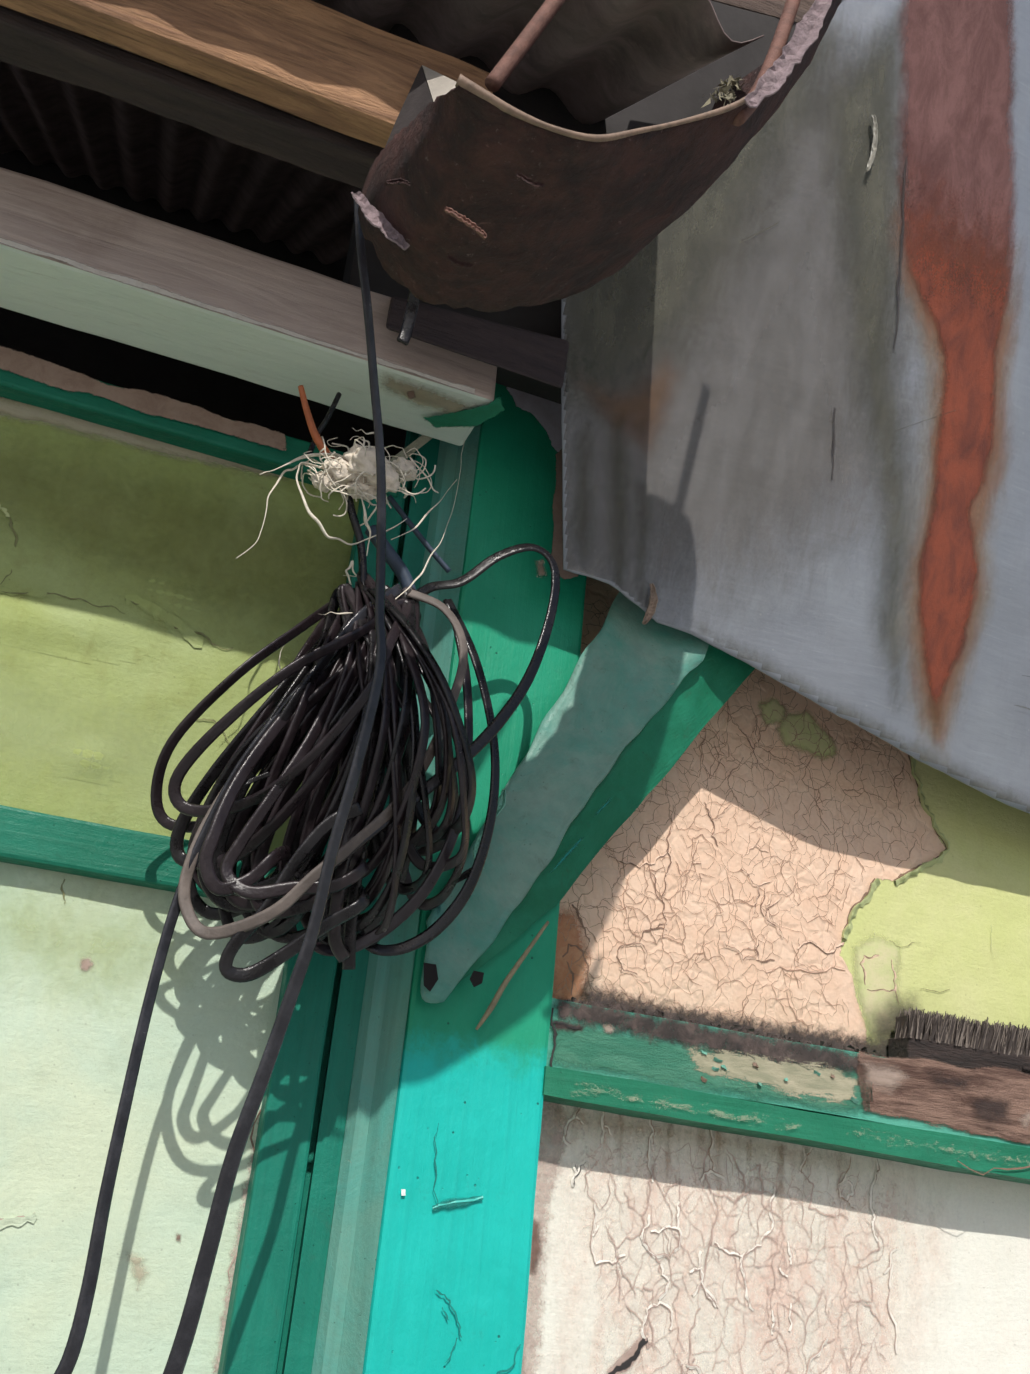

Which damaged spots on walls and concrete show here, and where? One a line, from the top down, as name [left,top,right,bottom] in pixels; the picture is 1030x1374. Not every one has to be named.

corrosion [444,206,487,240]
corrosion [901,0,1015,730]
peeling [506,387,619,656]
peeling [550,668,1030,1175]
crack [563,1107,898,1374]